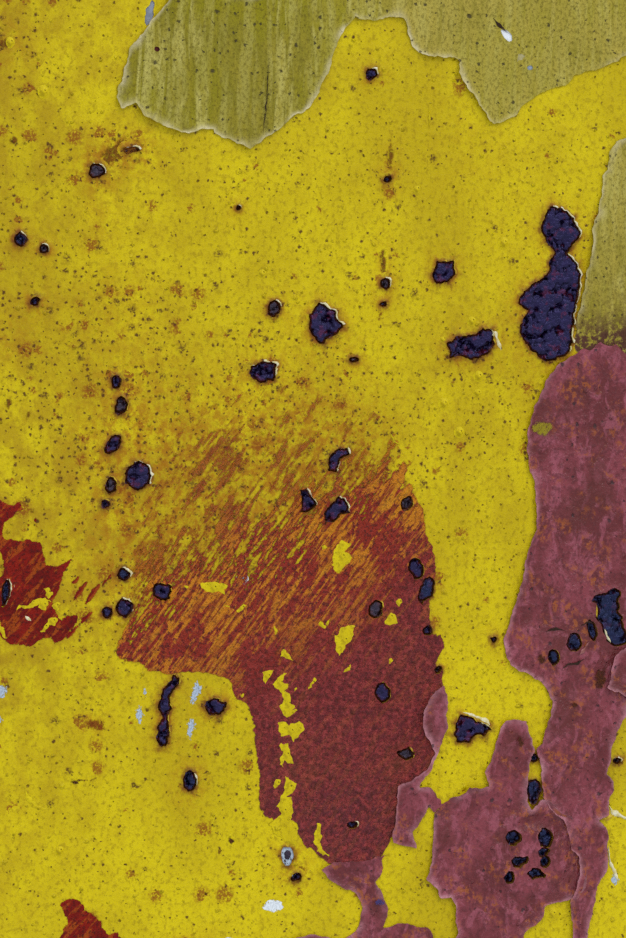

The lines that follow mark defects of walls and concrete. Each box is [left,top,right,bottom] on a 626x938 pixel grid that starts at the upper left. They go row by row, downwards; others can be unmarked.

peeling [117,0,626,149]
spalling [14,231,28,247]
peeling [72,138,626,938]